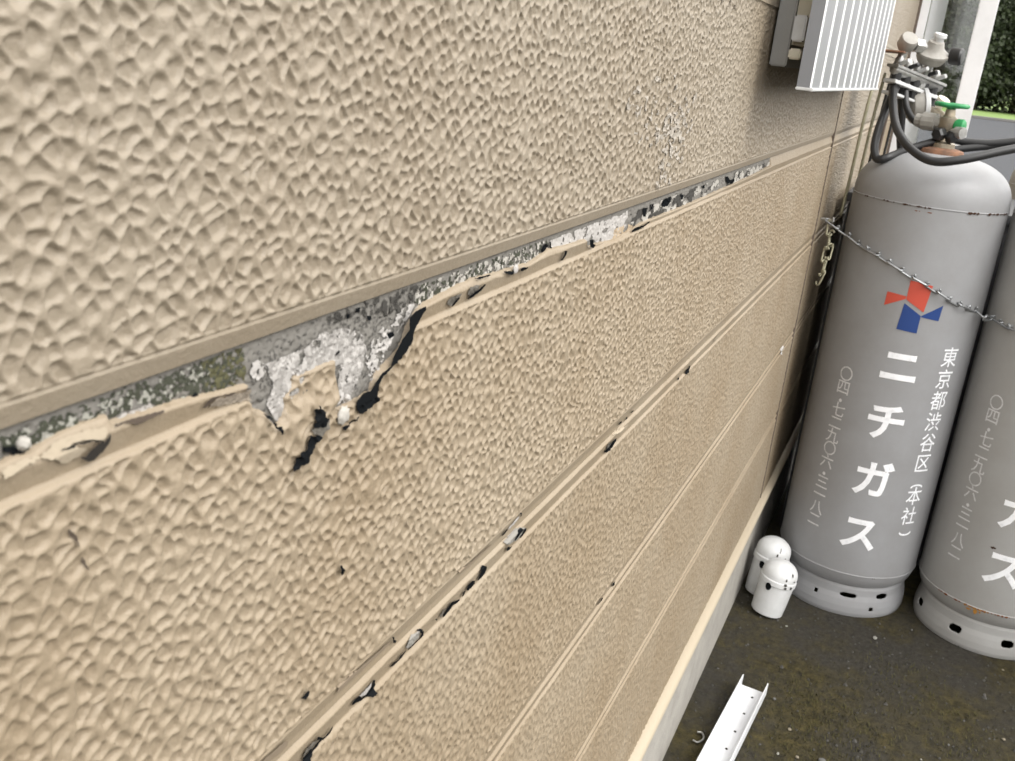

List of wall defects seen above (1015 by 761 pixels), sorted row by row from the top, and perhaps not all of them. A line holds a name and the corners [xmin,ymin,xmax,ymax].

spalling [0,158,770,480]
leakage [118,403,153,419]
spalling [504,517,525,545]